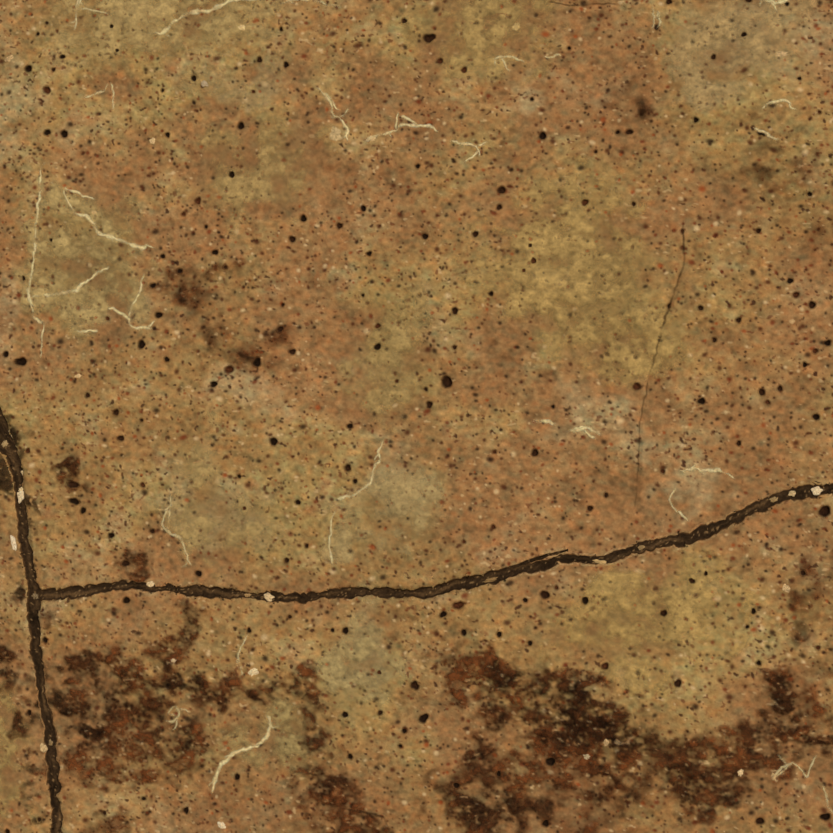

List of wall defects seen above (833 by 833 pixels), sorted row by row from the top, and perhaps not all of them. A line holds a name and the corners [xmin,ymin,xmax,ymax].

crack [0,405,833,833]
leakage [558,557,718,647]
leakage [605,659,647,694]
leakage [266,699,313,763]